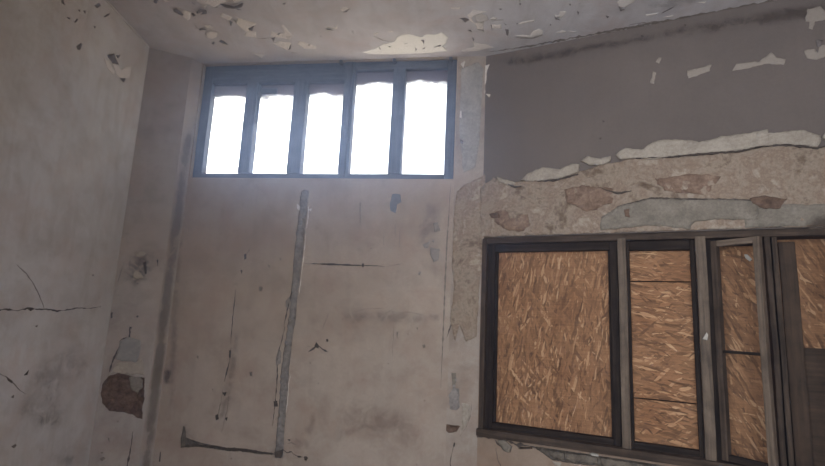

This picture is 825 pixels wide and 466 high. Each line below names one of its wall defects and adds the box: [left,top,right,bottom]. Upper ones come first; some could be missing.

peeling [153,0,316,54]
peeling [363,32,448,55]
peeling [459,4,579,172]
peeling [687,65,711,78]
peeling [732,52,786,71]
peeling [805,6,825,30]
flaking render [450,129,825,341]
crack [0,266,101,312]
crack [215,249,250,433]
crack [0,370,29,394]
flaking render [101,359,145,422]
flaking render [536,446,664,466]